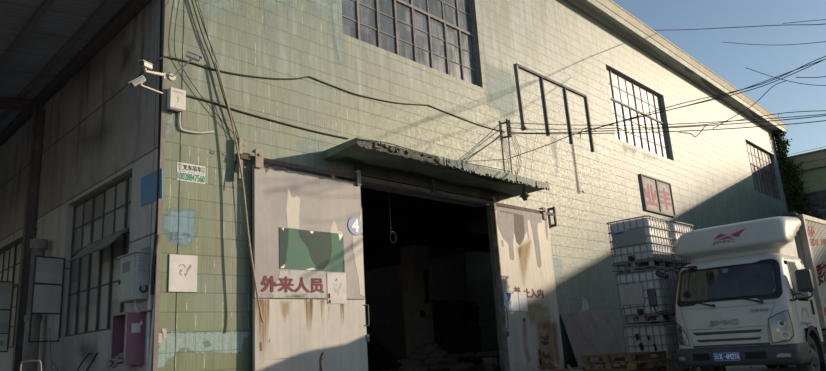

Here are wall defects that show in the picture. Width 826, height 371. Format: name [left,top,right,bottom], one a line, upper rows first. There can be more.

peeling [286,188,300,229]
rust [523,305,559,370]